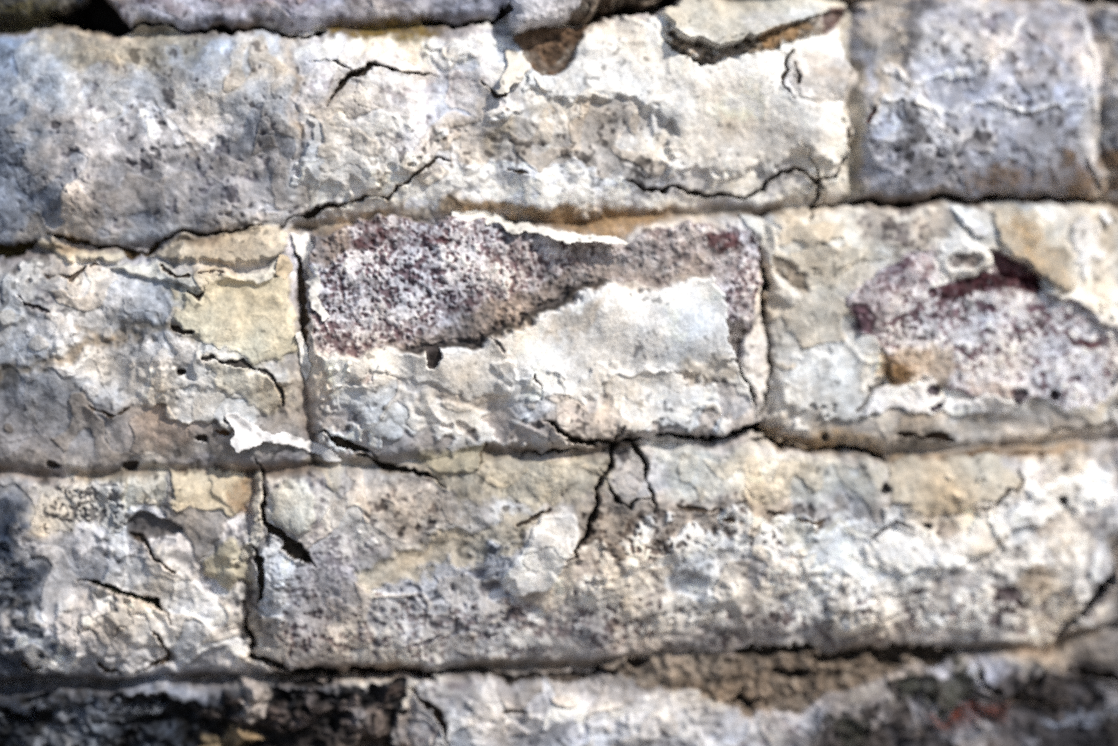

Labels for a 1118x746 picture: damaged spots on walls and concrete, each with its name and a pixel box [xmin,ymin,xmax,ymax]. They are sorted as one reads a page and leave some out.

crack [314,60,428,100]
spalling [495,0,660,95]
spalling [664,7,845,65]
crack [628,107,877,220]
spalling [174,210,802,462]
crack [727,233,773,409]
spalling [846,202,1118,425]
crack [244,465,311,673]
crack [522,374,735,558]
crack [766,511,825,525]
crack [1048,545,1117,644]
crack [977,665,1118,706]